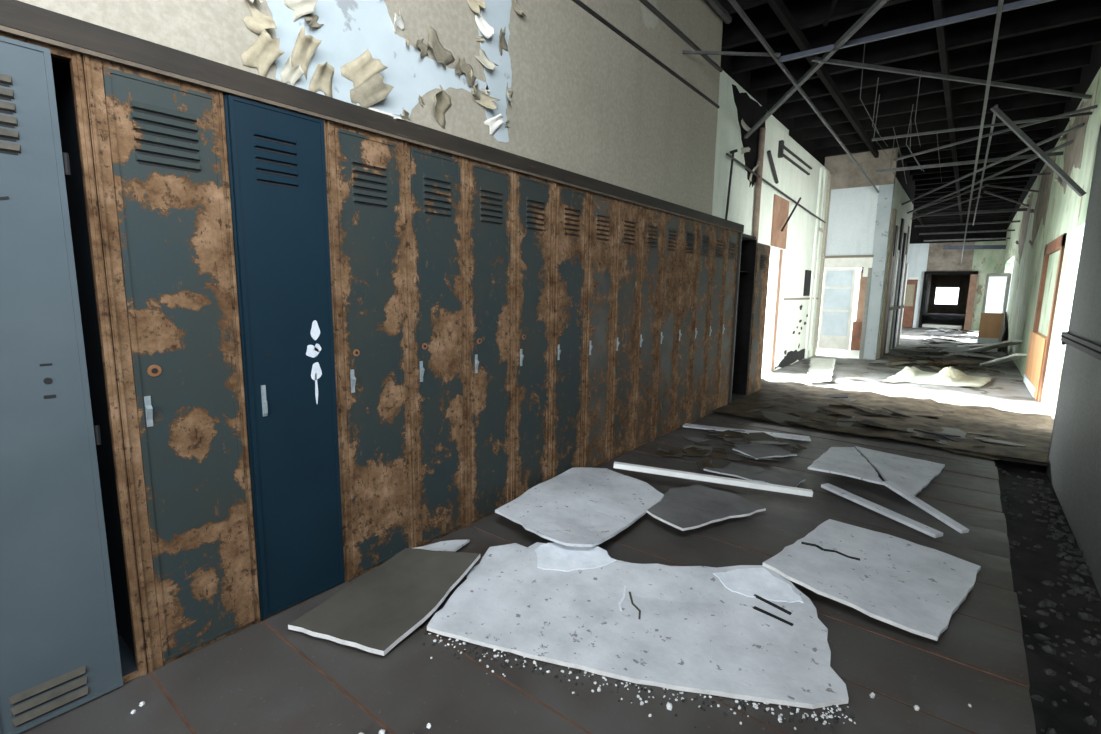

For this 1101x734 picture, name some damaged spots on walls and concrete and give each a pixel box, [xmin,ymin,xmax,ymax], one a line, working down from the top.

peeling [241,0,527,143]